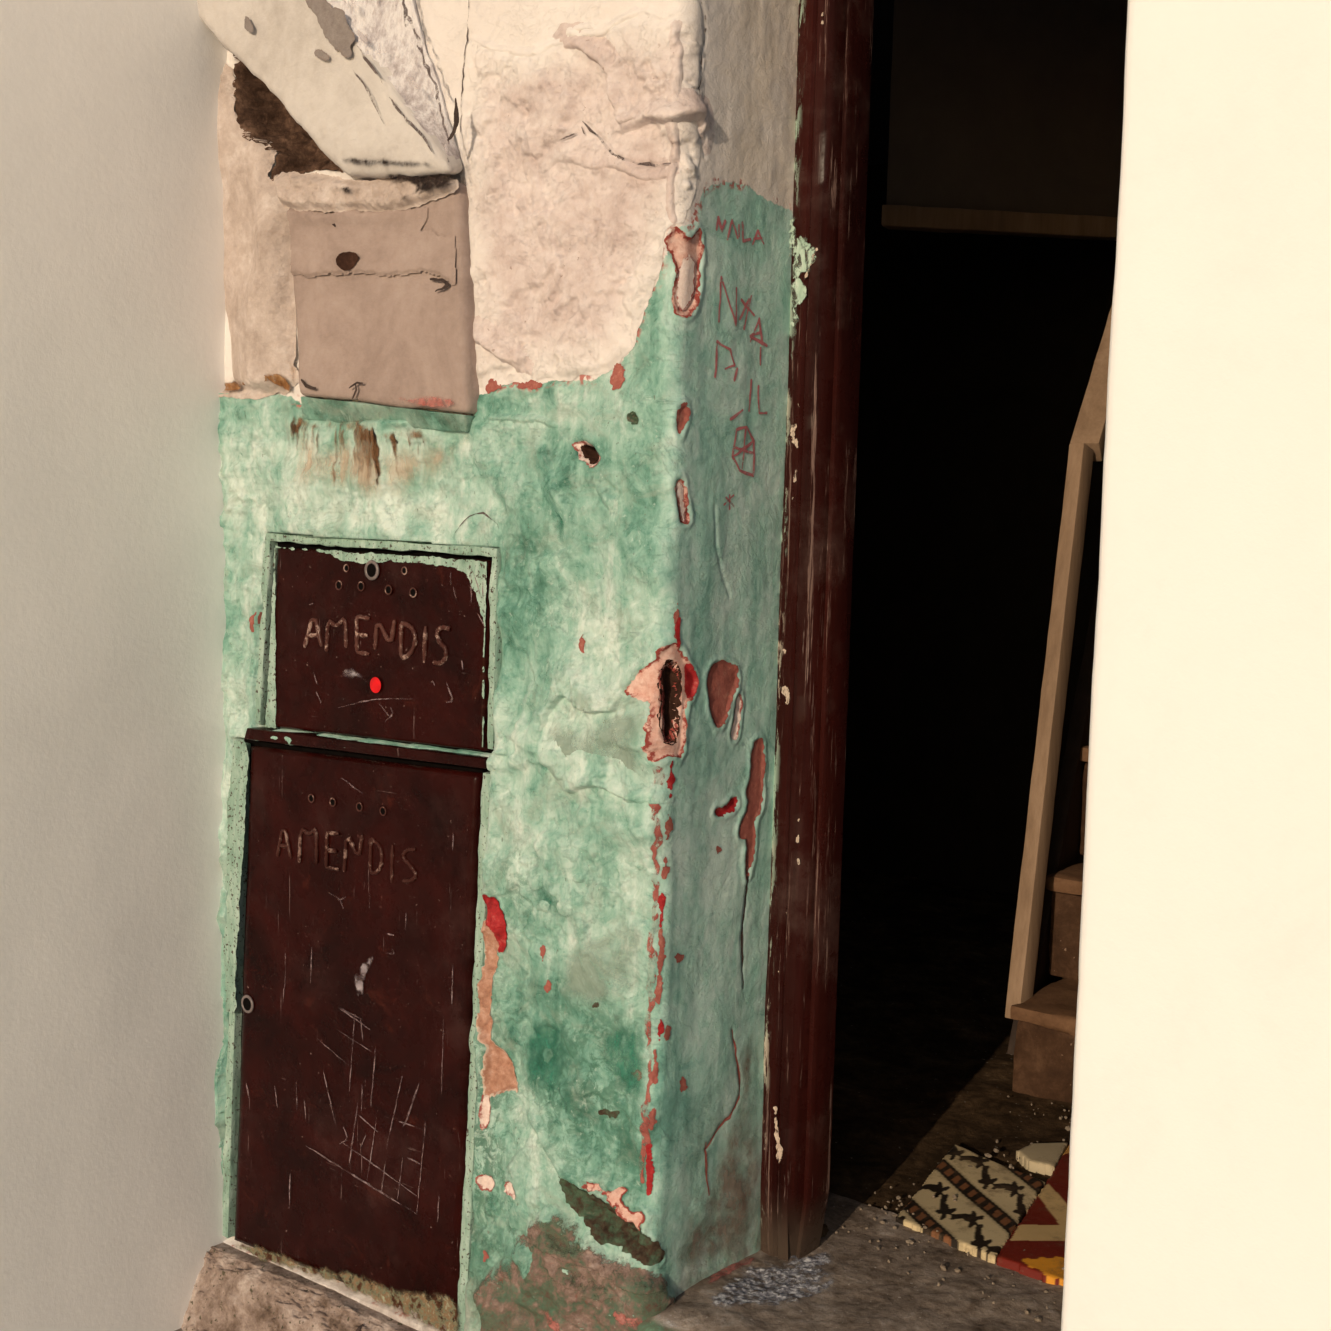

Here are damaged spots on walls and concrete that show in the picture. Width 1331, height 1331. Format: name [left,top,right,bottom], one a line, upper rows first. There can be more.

spalling [244,16,253,33]
spalling [305,0,355,61]
flaking render [445,3,715,394]
corrosion [329,424,421,486]
spalling [572,441,601,468]
peeling [715,738,766,880]
spalling [624,603,743,1196]
spalling [476,894,518,1130]
peeling [598,1109,620,1119]
flaking render [473,1174,676,1331]